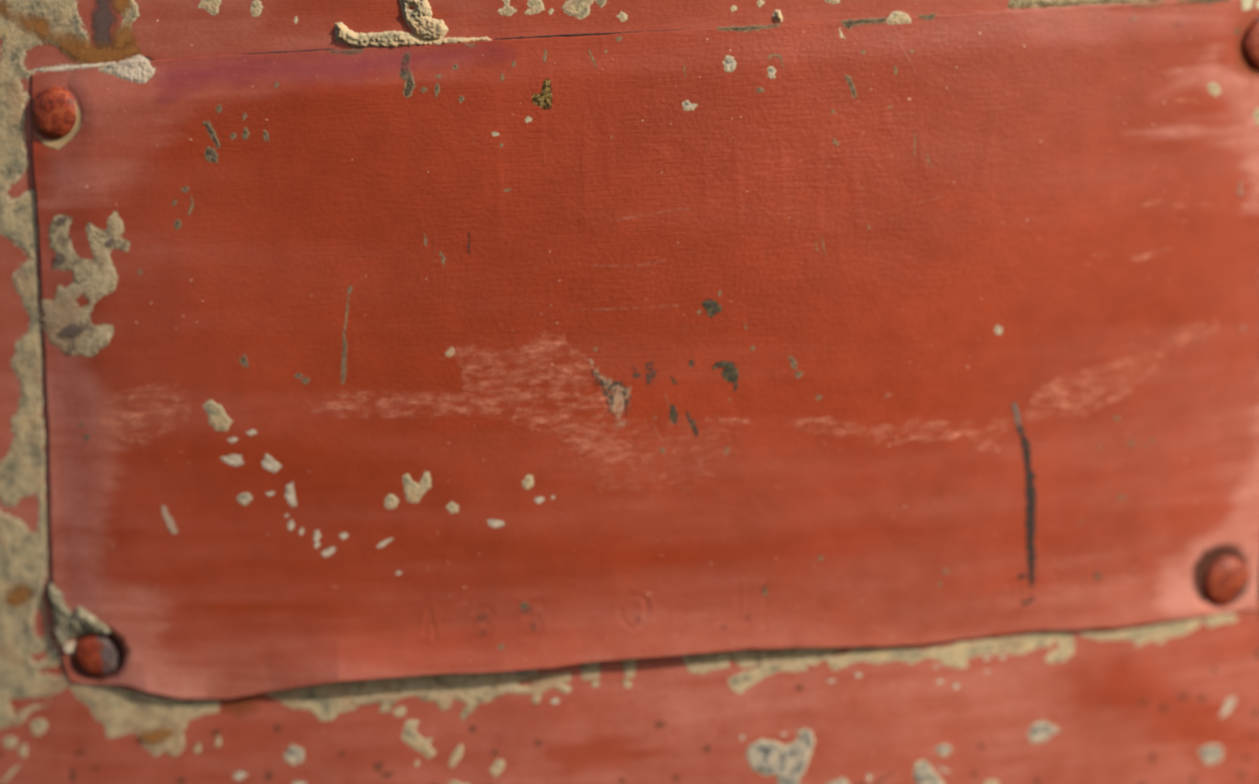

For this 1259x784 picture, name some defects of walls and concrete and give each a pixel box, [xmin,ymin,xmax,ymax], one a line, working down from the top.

corrosion [0,2,141,64]
peeling [335,0,492,98]
peeling [498,0,607,19]
peeling [1007,0,1259,20]
peeling [0,0,222,784]
peeling [203,399,257,467]
peeling [261,453,282,473]
peeling [236,482,348,557]
peeling [385,471,432,509]
peeling [682,613,1240,694]
peeling [267,662,601,784]
peeling [740,728,816,784]